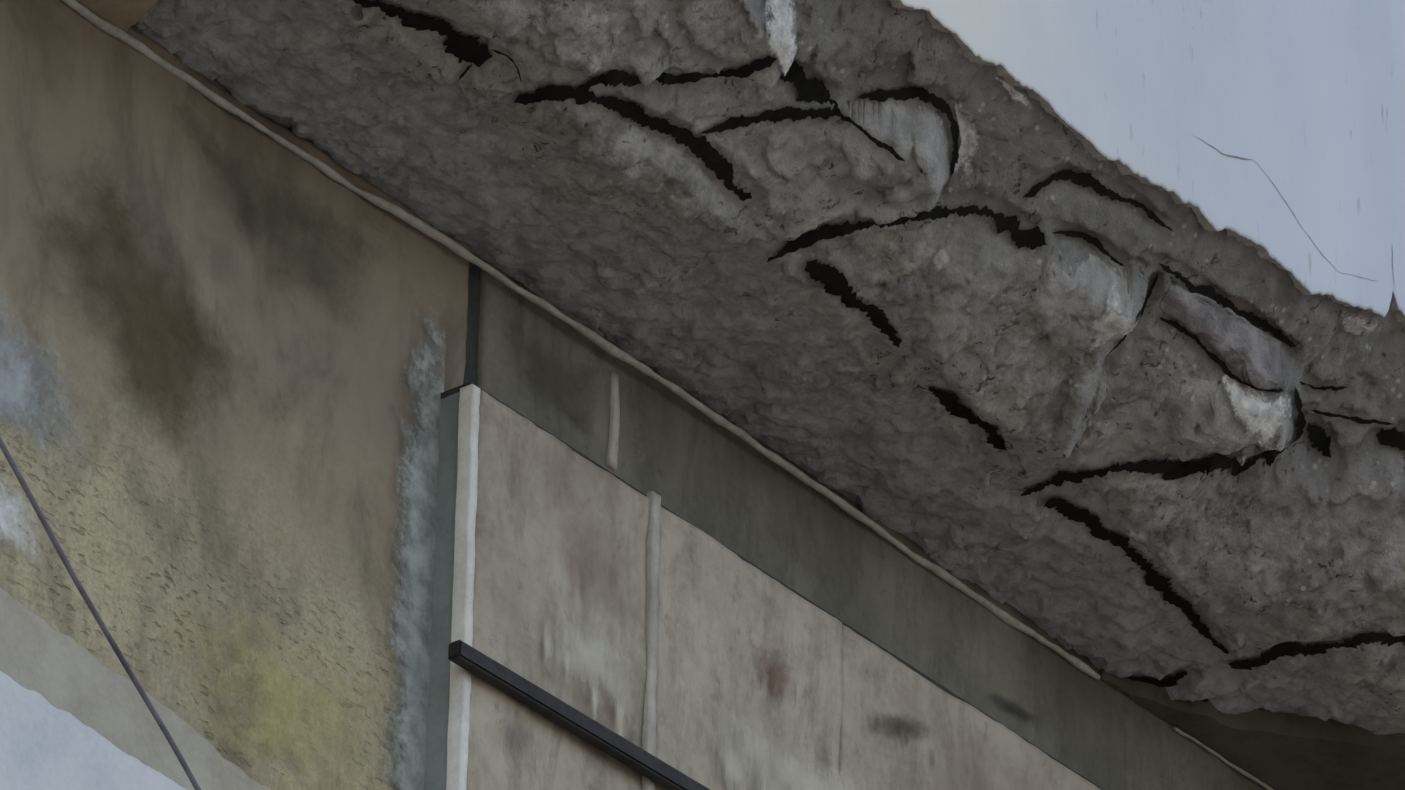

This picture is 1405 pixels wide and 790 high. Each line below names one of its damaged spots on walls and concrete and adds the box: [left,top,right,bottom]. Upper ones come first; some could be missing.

damp [0,323,67,448]
damp [66,188,224,422]
crack [353,0,1405,670]
spalling [1160,285,1287,390]
crack [1127,671,1209,702]